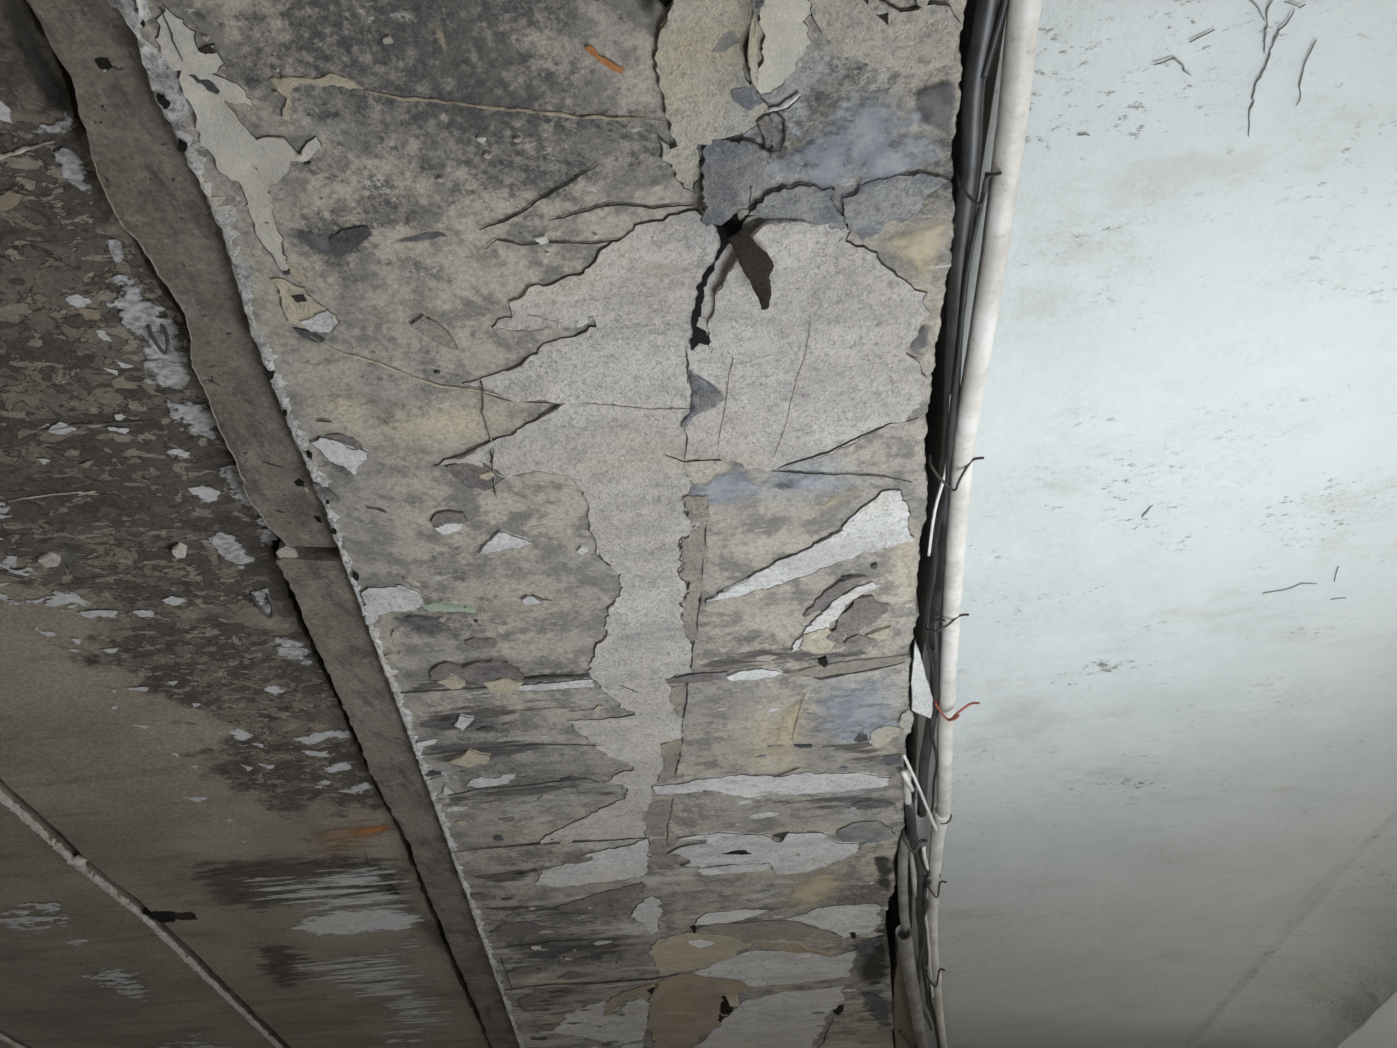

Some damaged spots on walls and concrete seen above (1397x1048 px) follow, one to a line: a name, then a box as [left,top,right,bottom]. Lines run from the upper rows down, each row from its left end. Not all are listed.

damp [11,20,92,195]
crack [479,163,693,250]
damp [106,239,217,440]
damp [208,465,277,569]
damp [251,588,271,613]
damp [274,637,312,665]
peeling [90,0,961,1048]
damp [185,855,468,1043]